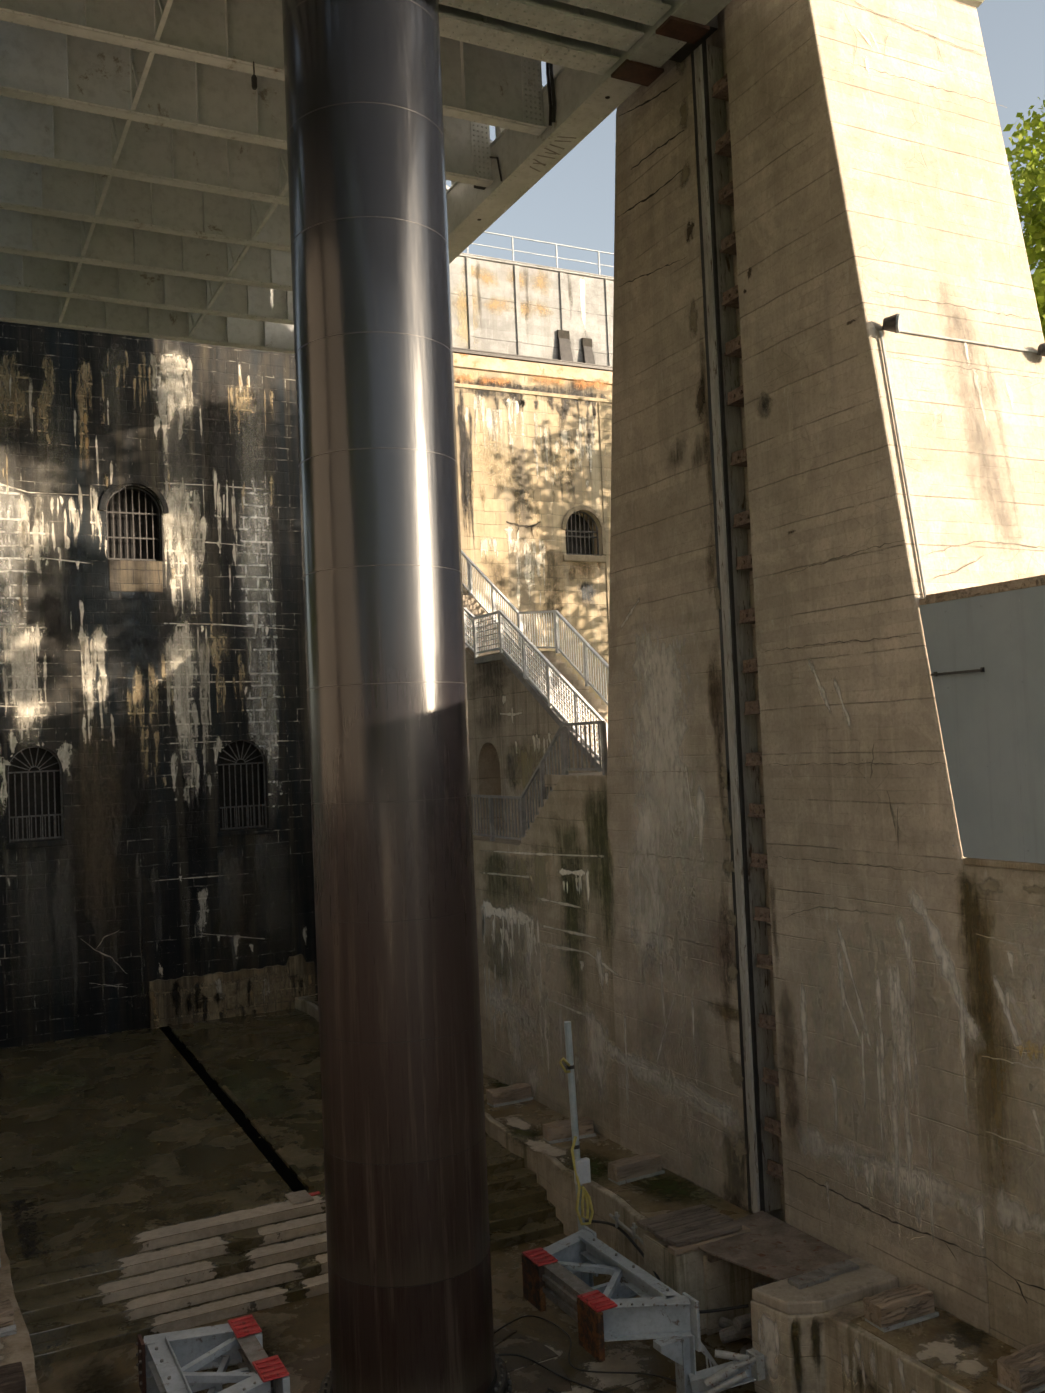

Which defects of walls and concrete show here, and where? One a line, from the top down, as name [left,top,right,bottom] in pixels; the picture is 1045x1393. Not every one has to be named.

crack [620,80,679,116]
crack [618,130,684,217]
corrosion [533,375,607,388]
leakage [454,377,606,622]
leakage [0,345,285,1013]
leakage [136,836,311,1026]
leakage [482,799,619,1099]
leakage [605,791,732,1127]
leakage [803,878,1045,1238]
crack [790,1169,1045,1304]
leakage [758,1315,820,1379]